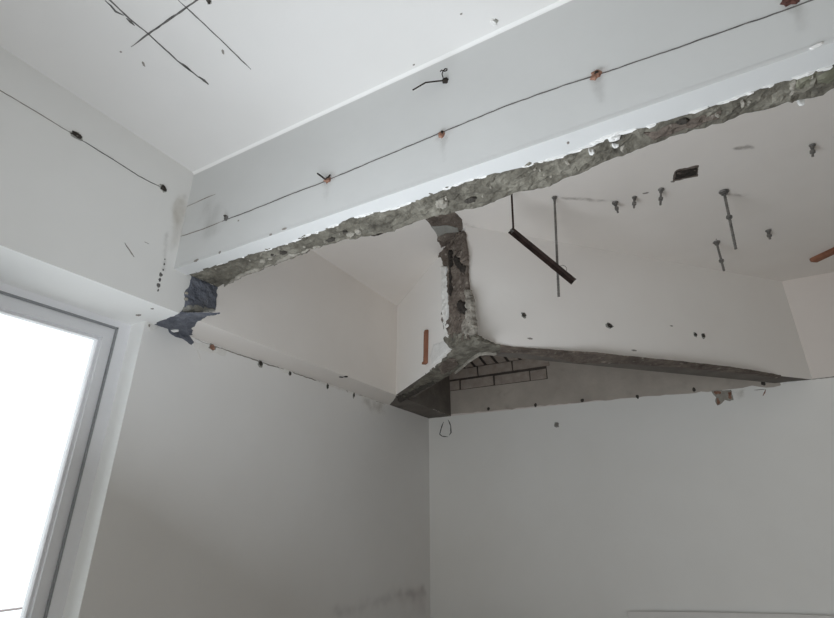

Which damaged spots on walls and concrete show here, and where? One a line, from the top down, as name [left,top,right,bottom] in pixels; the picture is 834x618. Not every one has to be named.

spalling [189,65,834,287]
peeling [390,231,797,418]